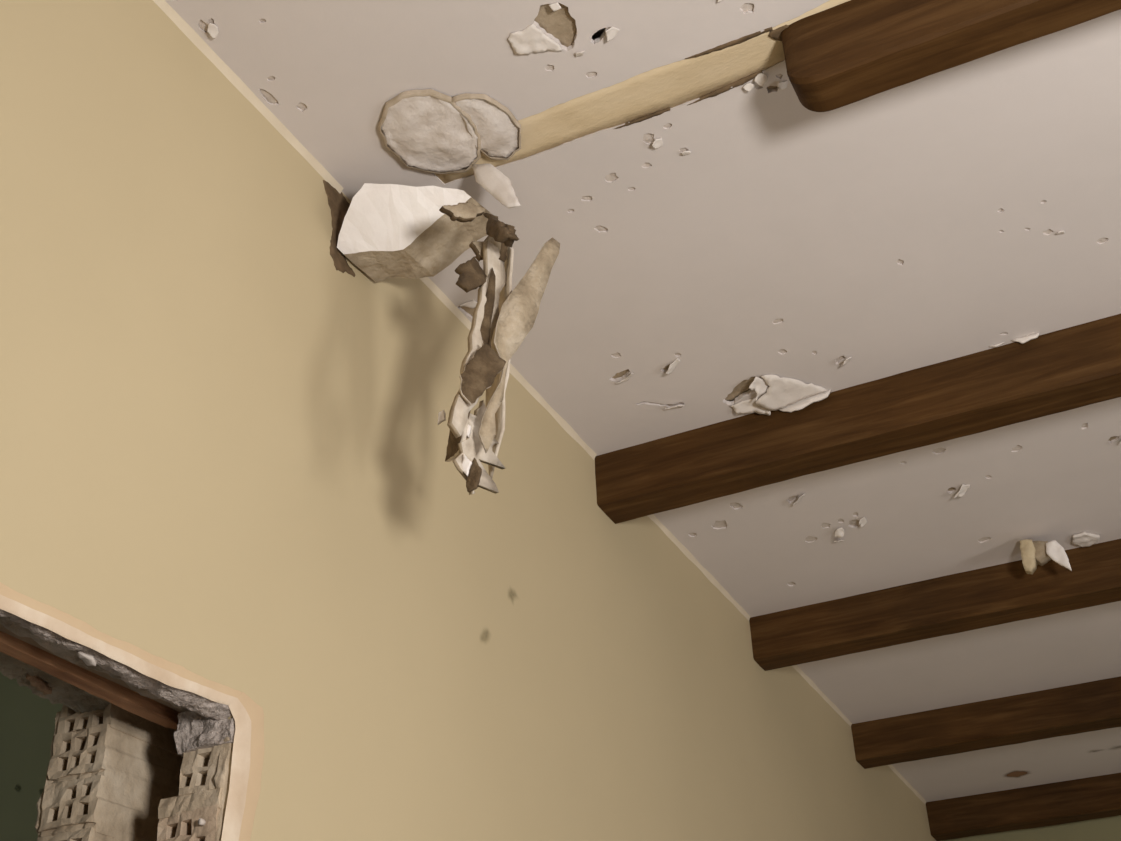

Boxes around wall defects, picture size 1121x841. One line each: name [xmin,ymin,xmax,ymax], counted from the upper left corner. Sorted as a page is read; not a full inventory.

flaking render [434,0,850,184]
spalling [323,180,355,277]
spalling [459,300,477,317]
peeling [725,374,831,415]
flaking render [0,582,265,841]